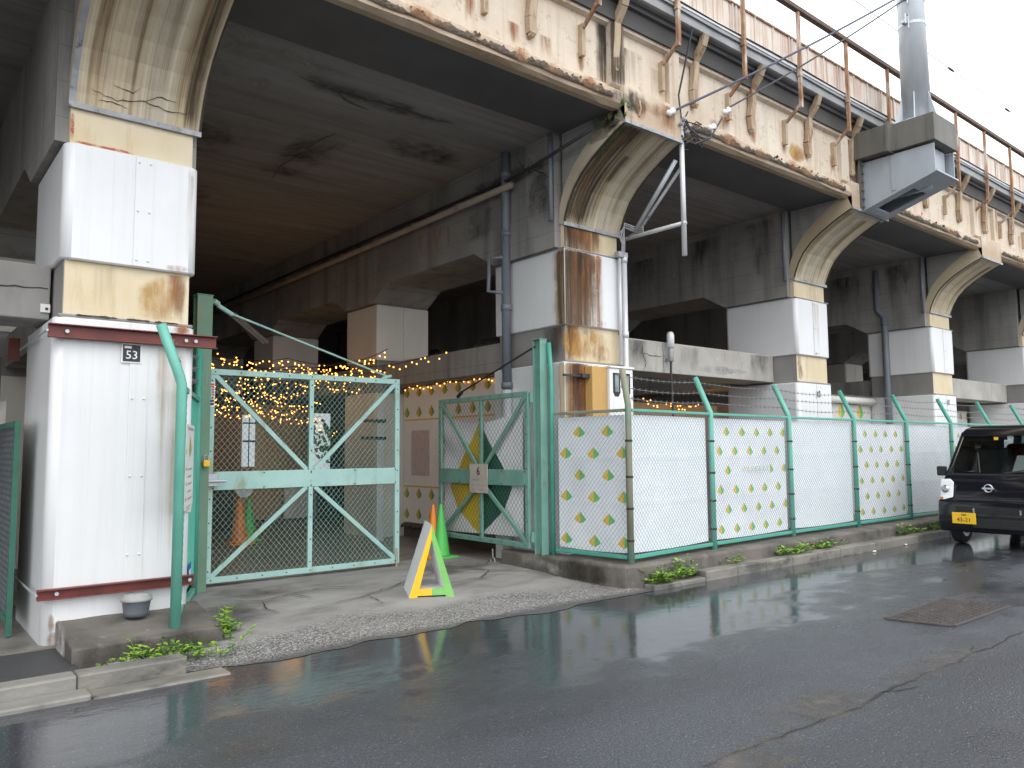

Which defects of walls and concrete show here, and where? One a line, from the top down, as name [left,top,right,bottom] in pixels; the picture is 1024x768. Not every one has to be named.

crack [94,86,187,115]
leakage [181,0,227,121]
spalling [372,0,613,97]
leakage [568,127,668,221]
spalling [690,125,846,191]
spalling [901,210,979,244]
corrosion [557,226,600,328]
corrosion [559,363,587,418]
crack [702,631,1023,768]